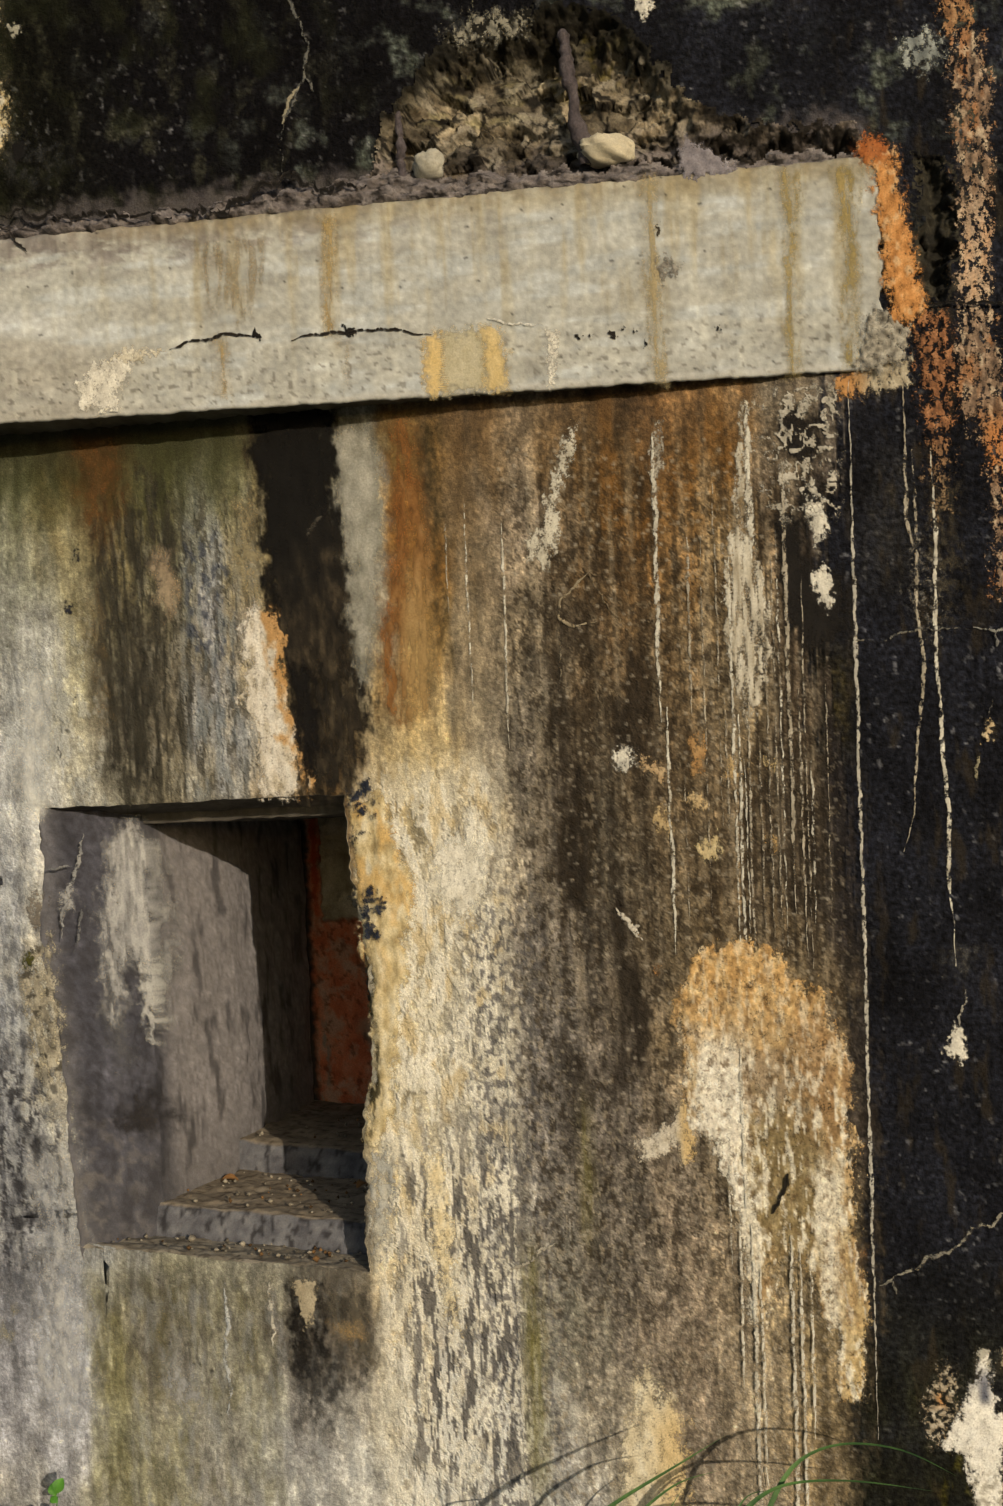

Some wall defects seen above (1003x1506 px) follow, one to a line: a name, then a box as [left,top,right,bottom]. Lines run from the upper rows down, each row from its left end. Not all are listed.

crack [0,0,367,252]
spalling [365,0,864,182]
crack [175,324,431,348]
rust [421,324,508,397]
rust [833,0,1003,604]
water stain [243,409,378,798]
rust [381,404,448,725]
water stain [648,420,690,953]
crack [848,626,1003,647]
water stain [902,379,956,960]
water stain [685,374,879,1506]
crack [879,1213,1003,1294]